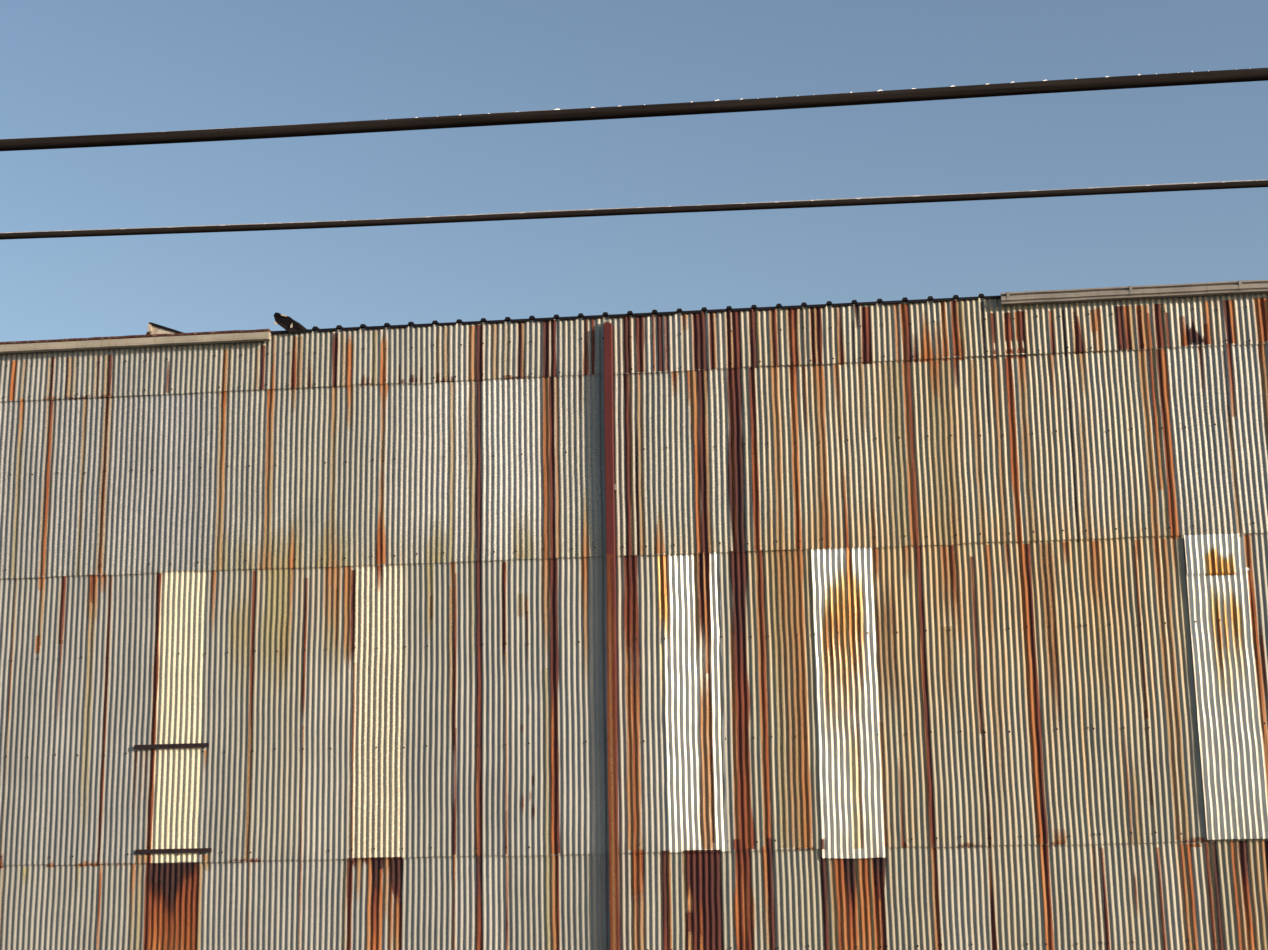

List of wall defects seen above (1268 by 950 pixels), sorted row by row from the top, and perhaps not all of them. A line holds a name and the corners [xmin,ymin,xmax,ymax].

rust [36,355,210,950]
rust [325,331,422,950]
rust [437,320,561,950]
rust [607,306,895,950]
rust [859,300,1069,950]
rust [1073,307,1103,379]
rust [1085,492,1100,588]
rust [1093,847,1110,950]
rust [1115,297,1268,950]